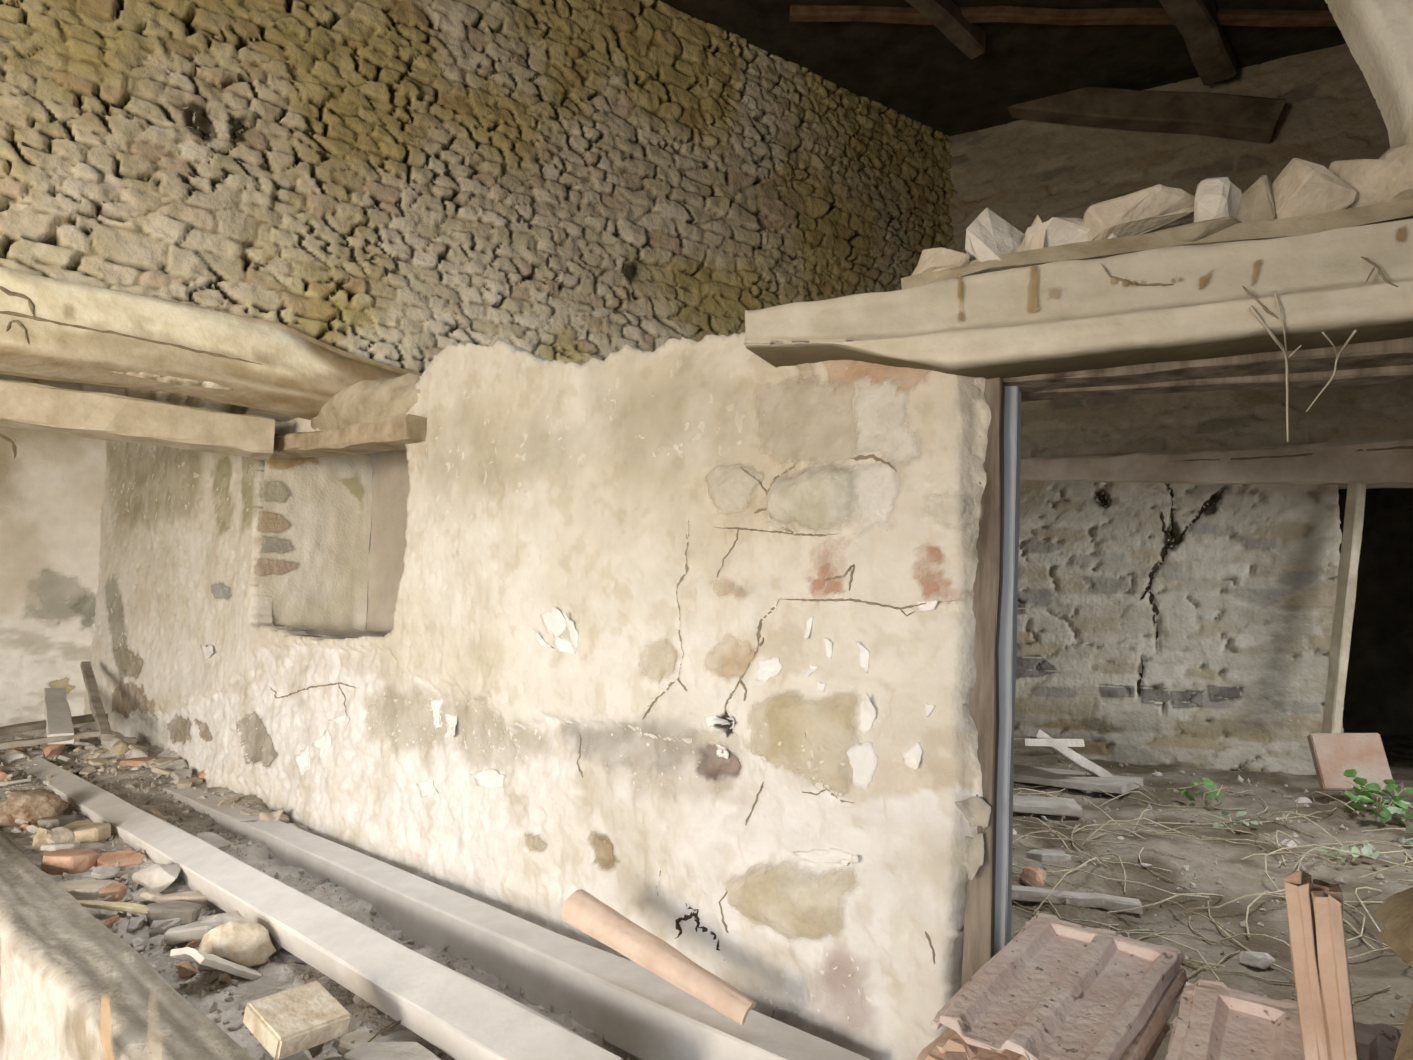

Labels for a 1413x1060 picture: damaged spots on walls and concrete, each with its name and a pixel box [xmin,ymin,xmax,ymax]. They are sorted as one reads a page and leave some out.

flaking render [798,360,929,532]
spalling [714,581,744,596]
crack [642,463,836,720]
flaking render [811,540,842,593]
flaking render [914,547,952,611]
crack [1137,483,1222,696]
spalling [706,637,783,682]
flaking render [803,617,833,692]
crack [724,564,964,716]
flaking render [856,641,870,673]
flaking render [847,693,878,791]